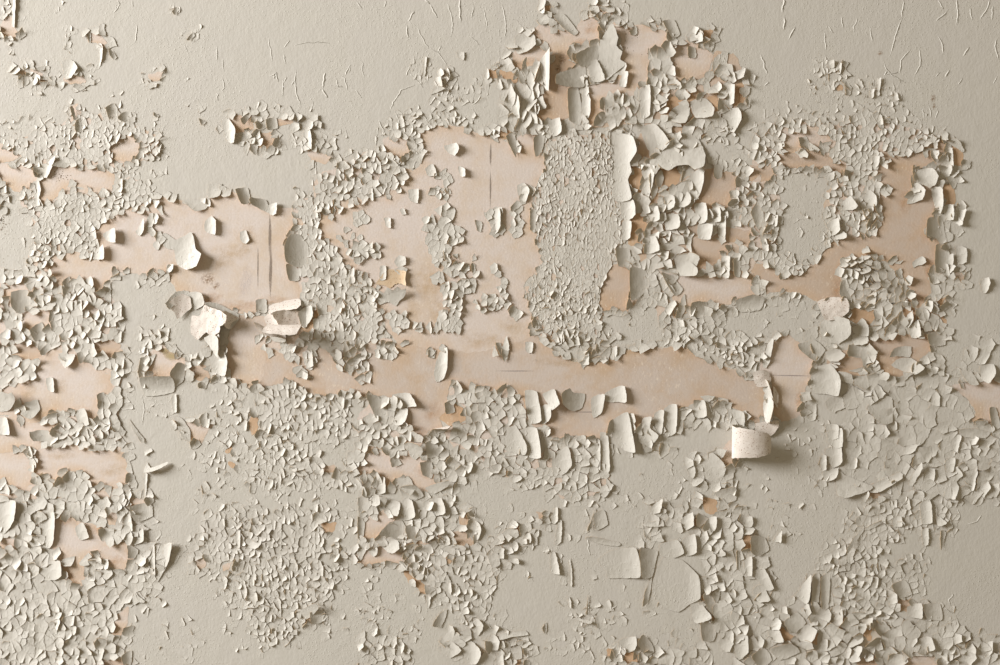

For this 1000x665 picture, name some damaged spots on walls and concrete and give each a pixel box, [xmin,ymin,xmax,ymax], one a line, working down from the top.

crack [884,0,999,85]
peeling [416,56,431,84]
peeling [431,65,497,107]
peeling [810,59,852,100]
peeling [874,76,886,99]
peeling [980,277,991,293]
peeling [487,532,512,546]
peeling [494,541,518,559]
peeling [504,512,551,546]
peeling [548,507,558,524]
peeling [541,544,572,587]
peeling [556,595,627,659]